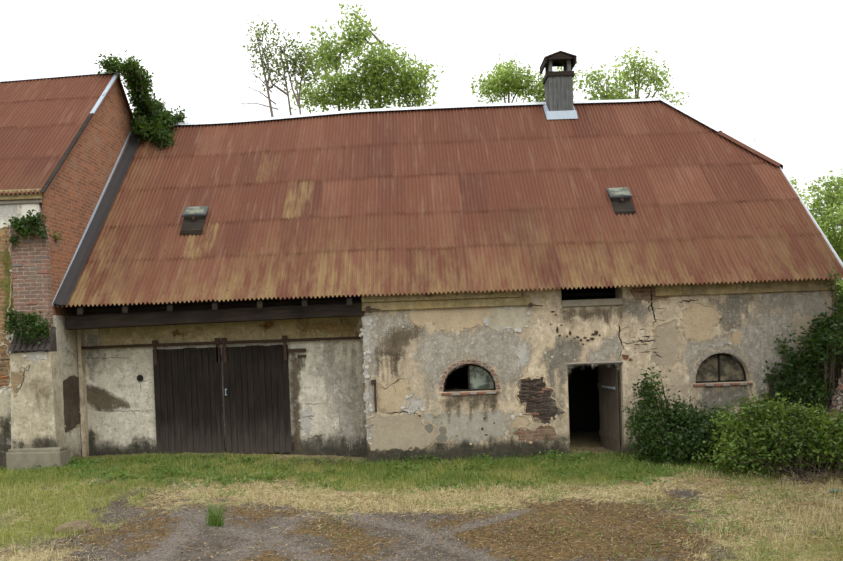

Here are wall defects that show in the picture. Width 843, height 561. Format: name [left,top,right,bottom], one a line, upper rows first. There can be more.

flaking render [0,225,25,434]
flaking render [23,351,47,362]